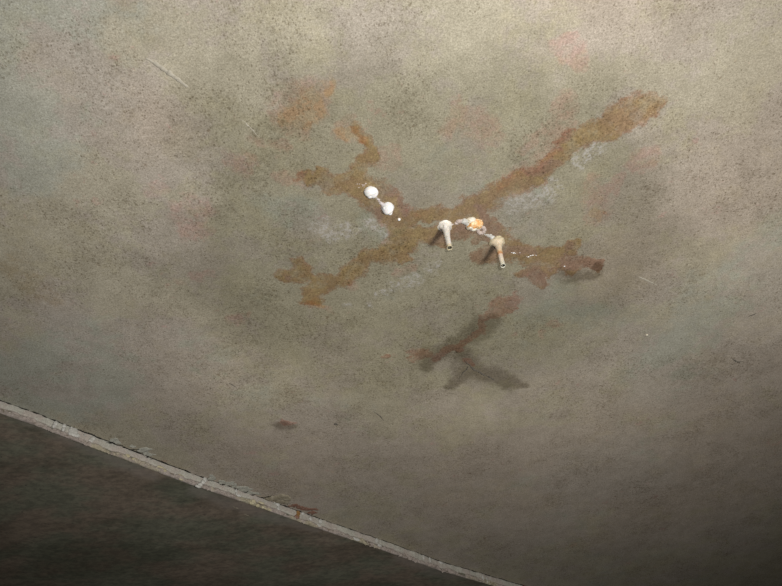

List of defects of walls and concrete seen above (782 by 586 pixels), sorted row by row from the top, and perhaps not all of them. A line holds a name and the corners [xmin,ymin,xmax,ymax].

corrosion [258,67,341,148]
leakage [100,0,728,457]
corrosion [266,85,671,306]